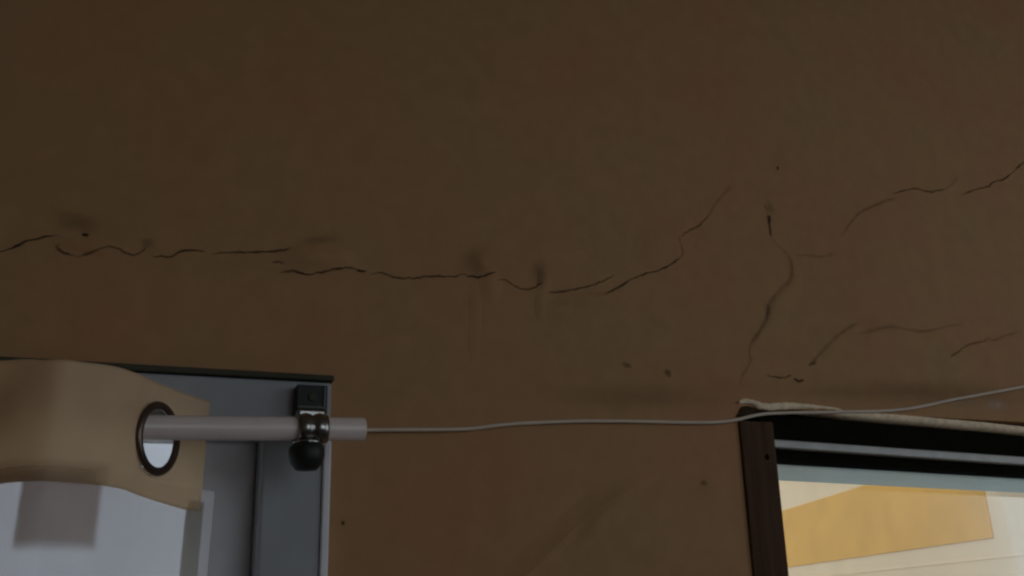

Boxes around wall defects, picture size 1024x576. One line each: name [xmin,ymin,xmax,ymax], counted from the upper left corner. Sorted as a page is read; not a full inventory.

crack [0,235,678,293]